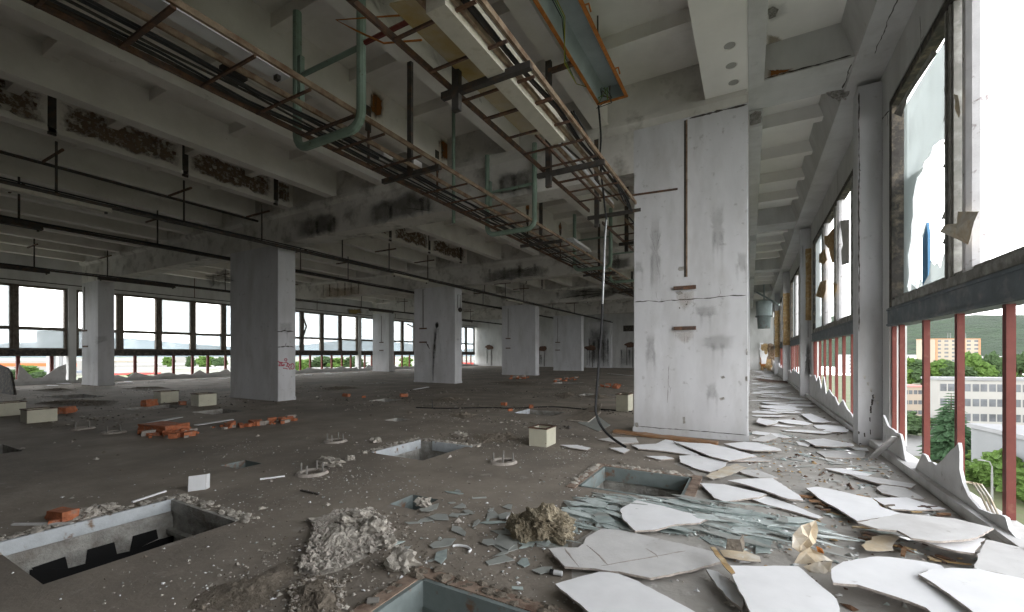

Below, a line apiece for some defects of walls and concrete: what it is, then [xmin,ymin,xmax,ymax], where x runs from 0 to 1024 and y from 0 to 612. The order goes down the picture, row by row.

peeling [0,79,41,120]
peeling [65,106,176,164]
peeling [193,155,289,201]
crack [765,0,898,329]
crack [636,291,746,304]